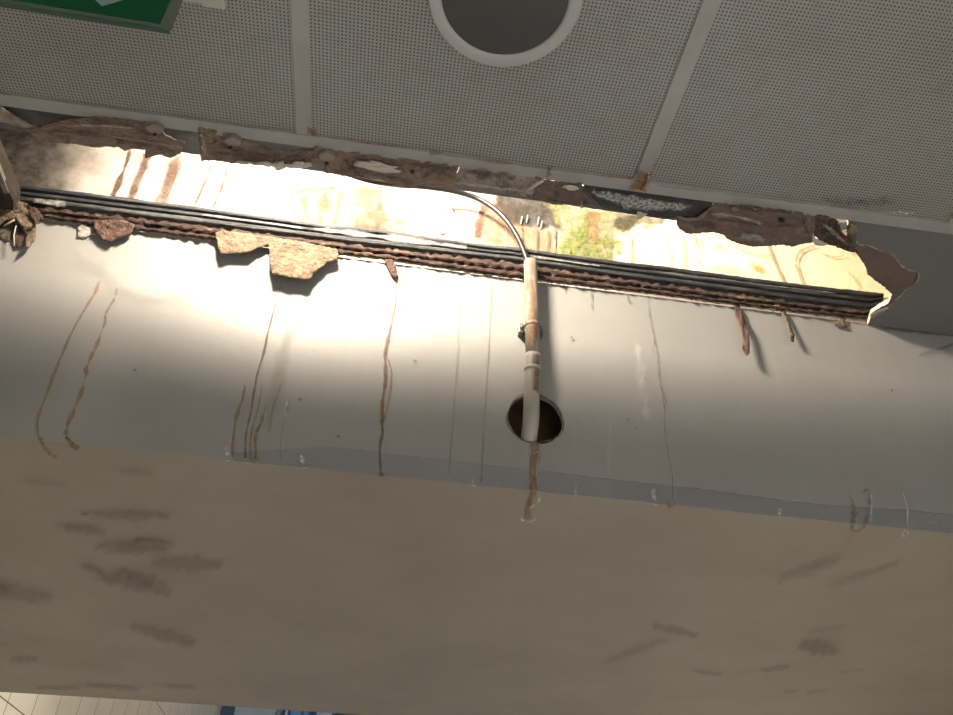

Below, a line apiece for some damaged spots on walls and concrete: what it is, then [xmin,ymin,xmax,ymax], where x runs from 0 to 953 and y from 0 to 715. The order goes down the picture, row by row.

rust [111,151,150,198]
rust [156,158,180,203]
leakage [258,182,432,244]
leakage [496,195,564,229]
flaking render [593,191,920,322]
rust [25,204,870,476]
crack [626,294,674,508]
rust [520,442,539,522]